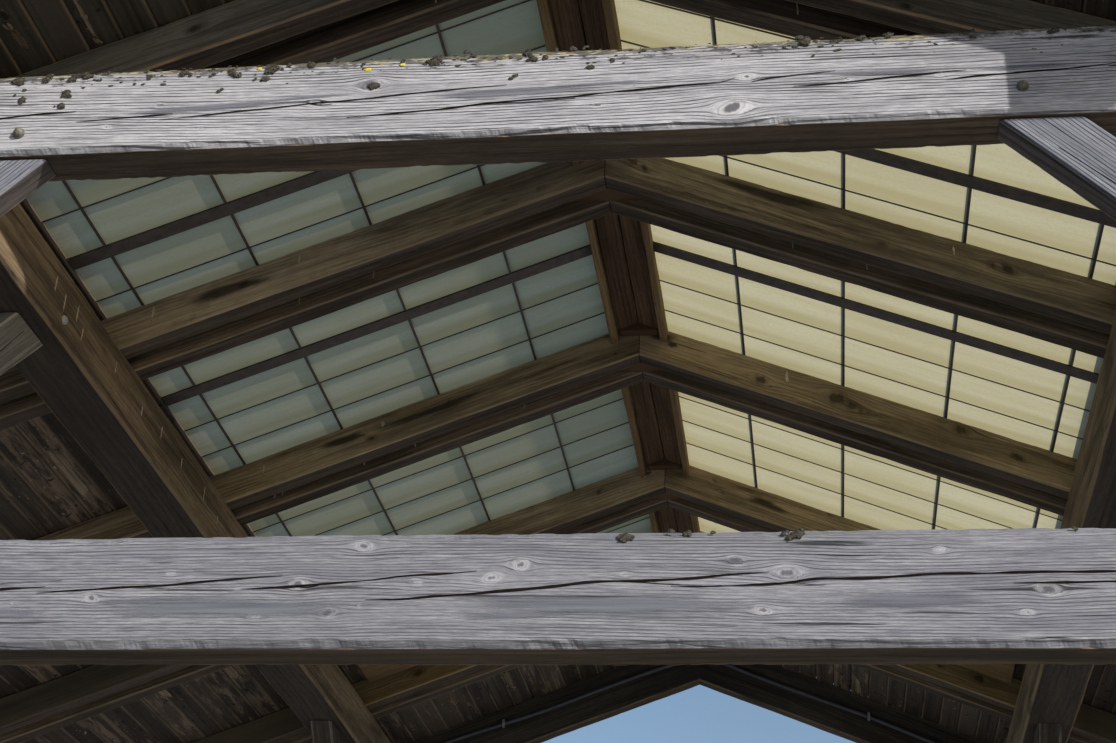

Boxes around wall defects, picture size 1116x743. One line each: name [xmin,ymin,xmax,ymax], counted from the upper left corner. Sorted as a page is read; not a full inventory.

crack [0,62,1116,122]
crack [0,570,1116,600]